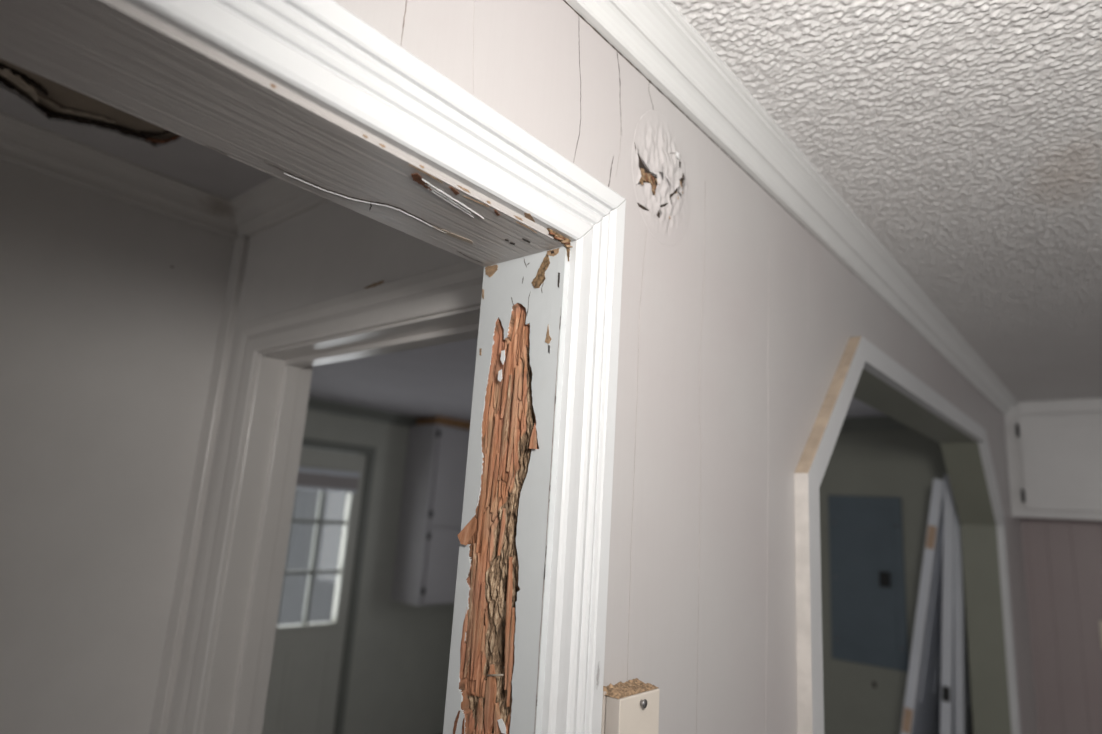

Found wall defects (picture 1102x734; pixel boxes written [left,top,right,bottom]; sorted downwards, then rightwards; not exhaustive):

peeling [410,165,500,219]
spalling [635,145,684,218]
peeling [505,213,537,245]